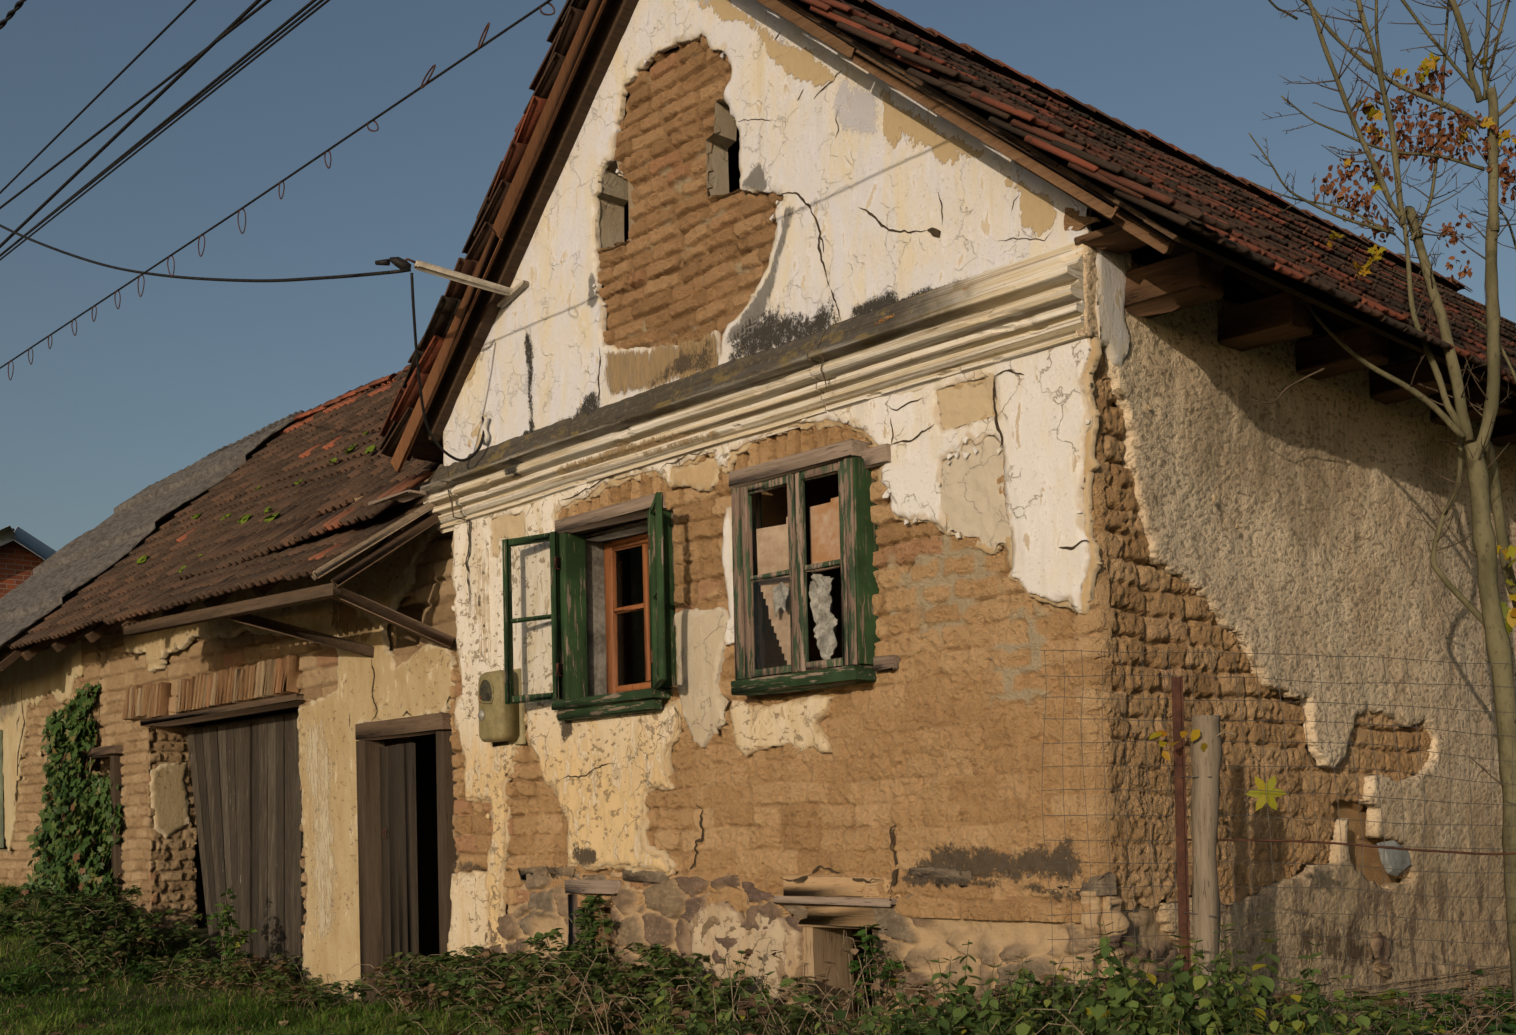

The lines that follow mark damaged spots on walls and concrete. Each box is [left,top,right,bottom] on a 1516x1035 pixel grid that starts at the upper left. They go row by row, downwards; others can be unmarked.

damp [523,333,534,436]
spalling [592,35,784,349]
damp [569,207,958,420]
crack [780,192,841,319]
crack [810,344,827,391]
crack [860,192,943,238]
flaking render [493,512,525,554]
spalling [558,418,873,614]
spalling [0,621,338,927]
spalling [391,530,651,908]
damp [901,838,1083,900]
spalling [645,348,1431,923]